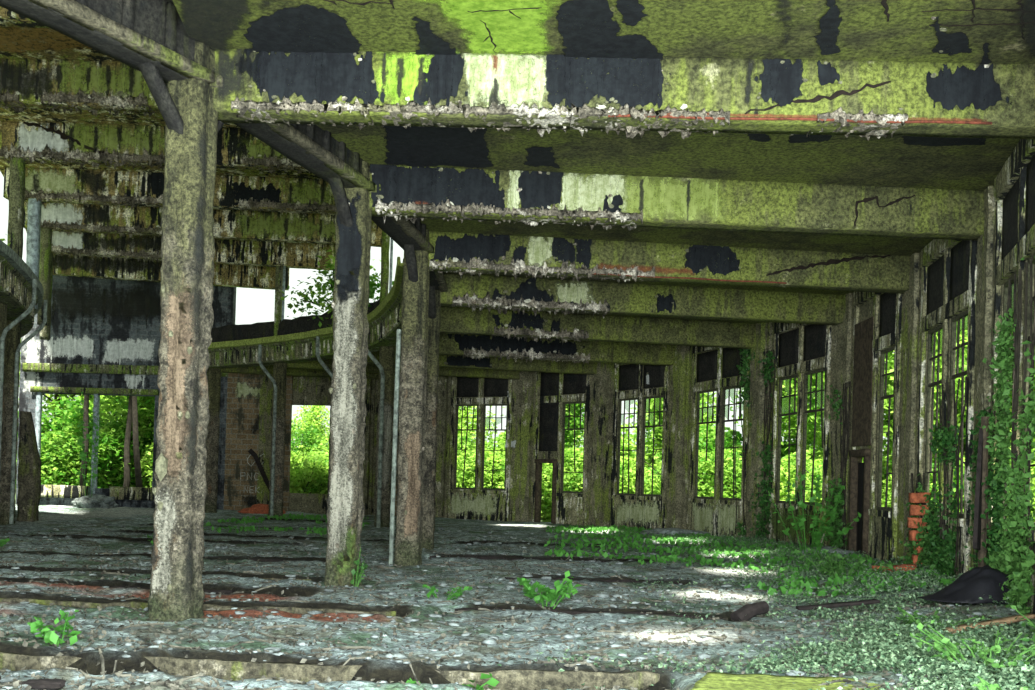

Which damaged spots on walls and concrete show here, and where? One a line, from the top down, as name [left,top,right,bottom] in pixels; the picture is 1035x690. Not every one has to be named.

crack [467,7,542,53]
damp [0,60,150,100]
damp [381,53,425,104]
damp [464,53,546,108]
damp [745,61,753,104]
crack [744,81,891,114]
damp [15,123,122,156]
crack [854,195,915,226]
peeling [231,0,1012,558]
crack [766,255,891,276]